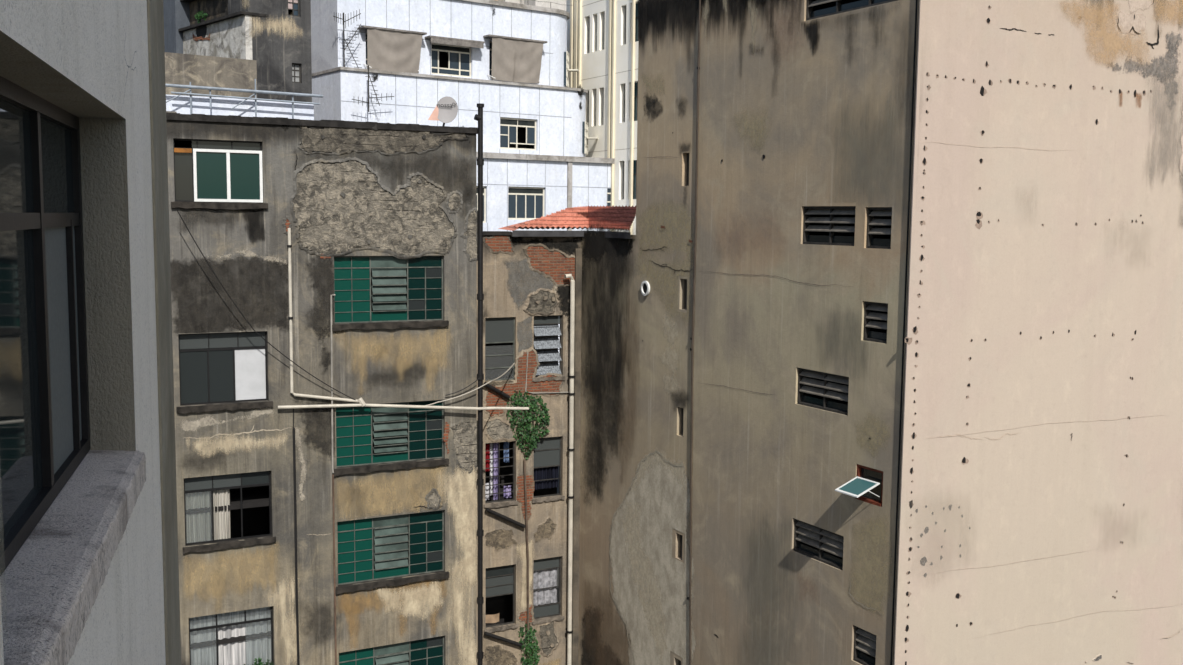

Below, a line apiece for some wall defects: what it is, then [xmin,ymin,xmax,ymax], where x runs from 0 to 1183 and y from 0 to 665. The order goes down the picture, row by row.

spalling [1093,32,1182,108]
peeling [208,250,287,264]
spalling [282,122,575,317]